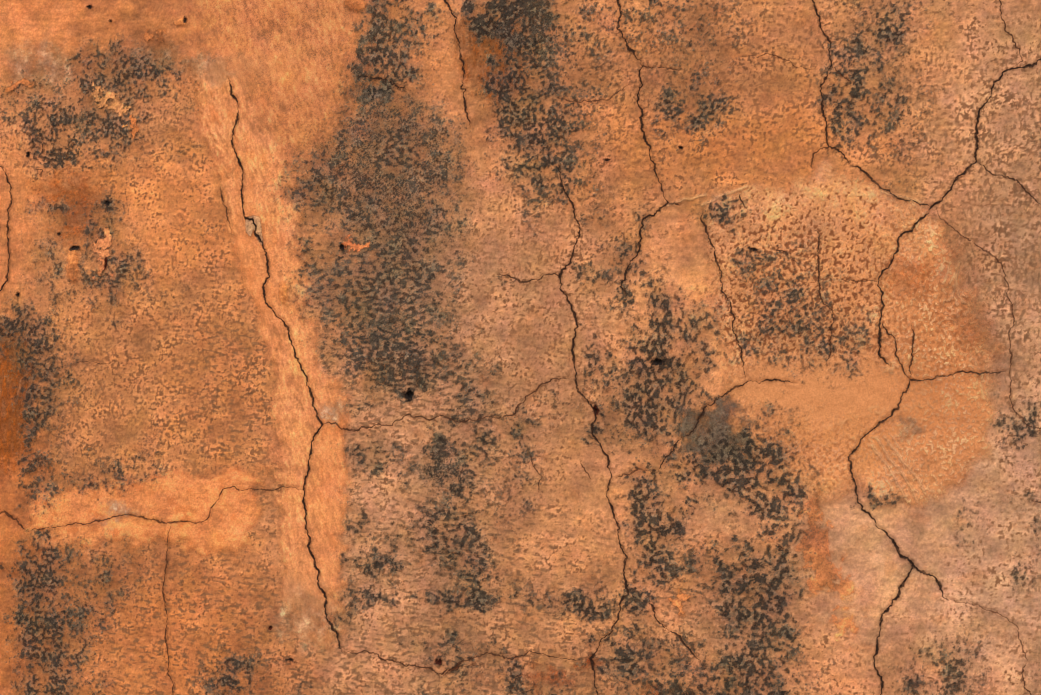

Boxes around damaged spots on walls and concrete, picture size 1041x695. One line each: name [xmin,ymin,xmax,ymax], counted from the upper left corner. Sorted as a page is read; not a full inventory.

water stain [0,39,204,514]
crack [0,0,792,695]
water stain [273,0,883,695]
mould [815,0,932,171]
crack [741,0,1041,695]
mould [0,526,143,695]
mould [194,646,271,695]
mould [897,639,991,695]